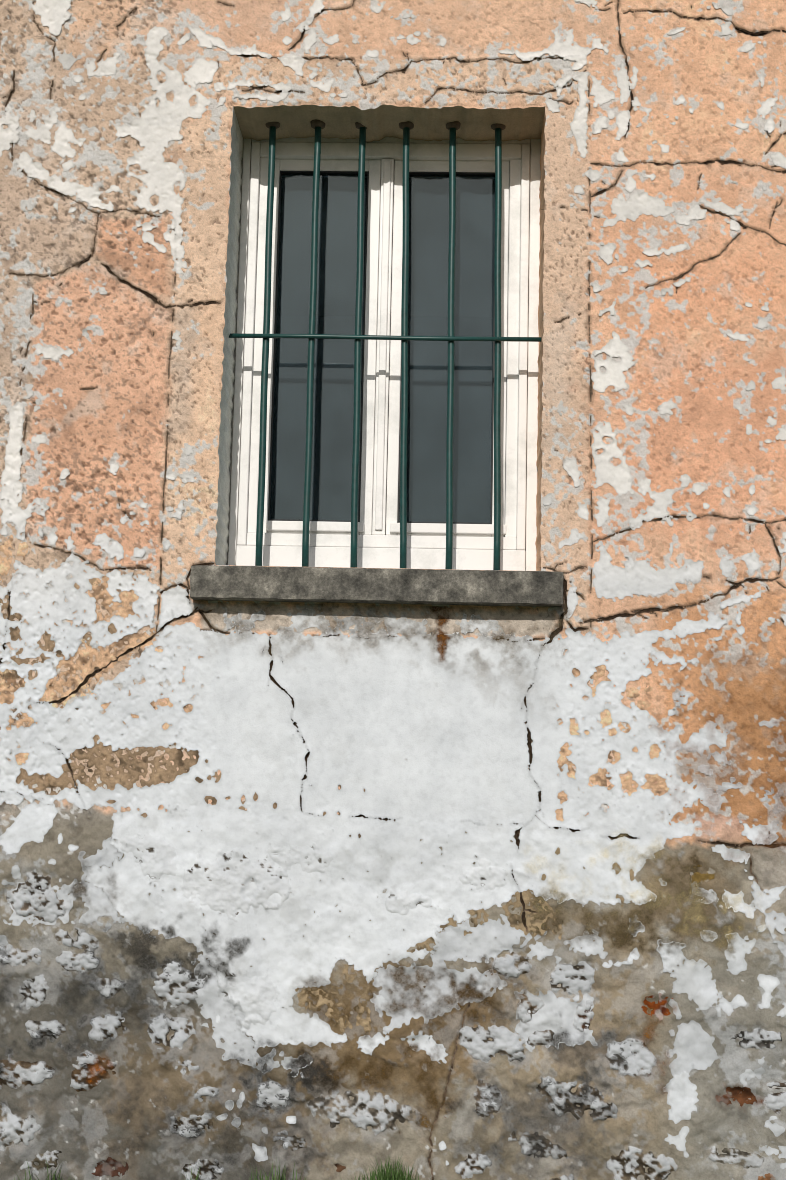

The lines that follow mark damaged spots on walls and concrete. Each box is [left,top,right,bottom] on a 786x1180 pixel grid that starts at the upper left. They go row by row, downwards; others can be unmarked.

peeling [116,0,379,274]
crack [217,0,590,127]
peeling [499,26,743,231]
crack [495,0,786,656]
crack [9,143,324,816]
peeling [0,384,761,1078]
rust [432,606,449,660]
crack [512,683,580,932]
water stain [115,926,249,986]
water stain [233,1050,354,1153]
water stain [388,966,502,1022]
peeling [656,788,786,1158]